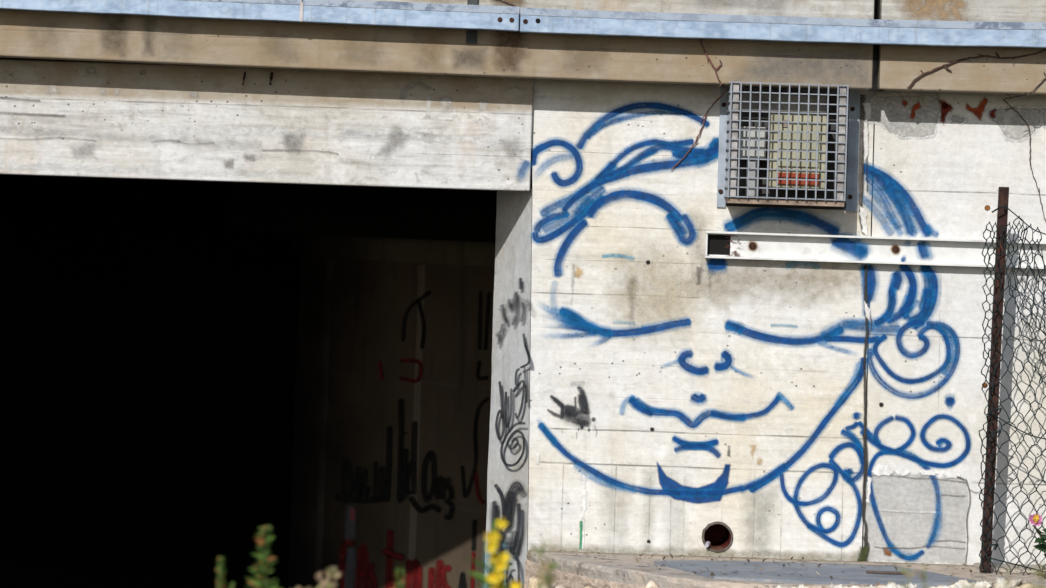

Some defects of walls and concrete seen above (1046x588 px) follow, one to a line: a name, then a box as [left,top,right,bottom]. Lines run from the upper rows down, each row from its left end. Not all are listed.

peeling [865,93,967,139]
rust [938,100,953,123]
rust [966,98,996,120]
peeling [986,105,1046,141]